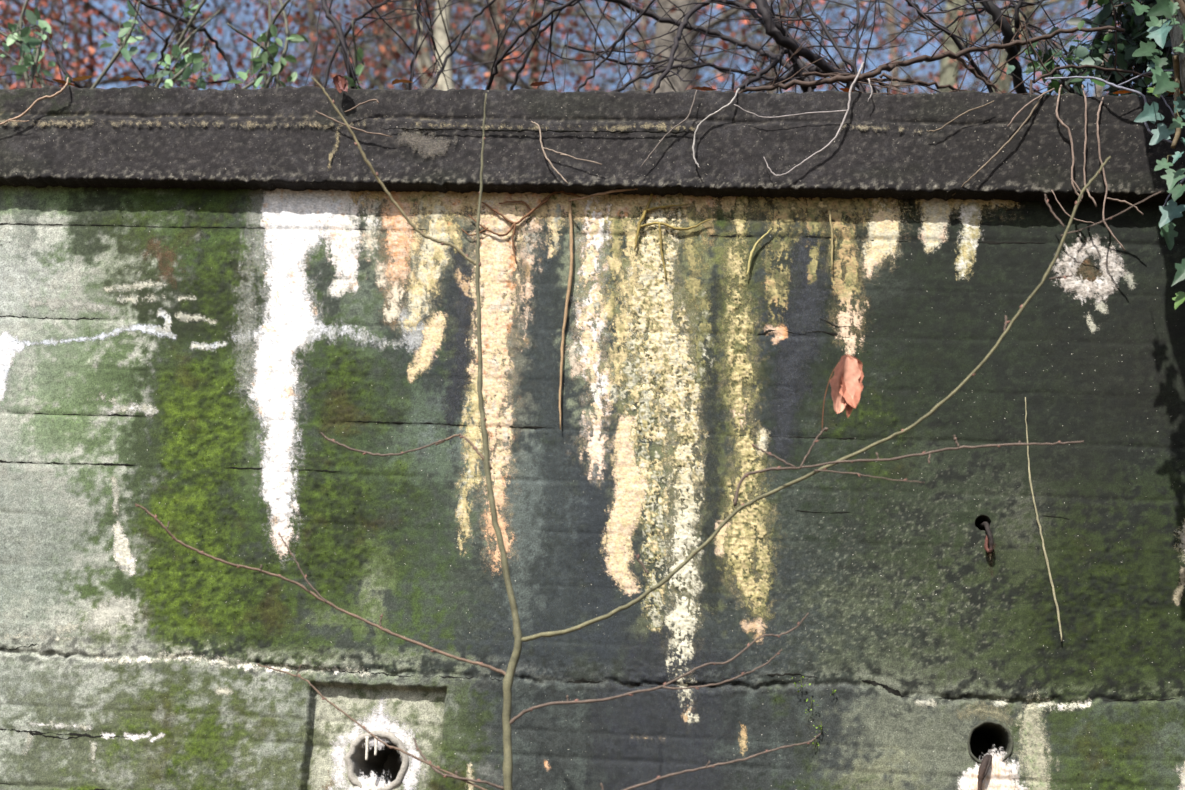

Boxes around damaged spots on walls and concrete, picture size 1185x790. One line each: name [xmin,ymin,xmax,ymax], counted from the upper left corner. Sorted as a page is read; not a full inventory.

damp [1052,233,1135,333]
damp [232,189,1020,790]
damp [1173,519,1185,606]
damp [958,694,1091,790]
damp [1177,762,1185,790]